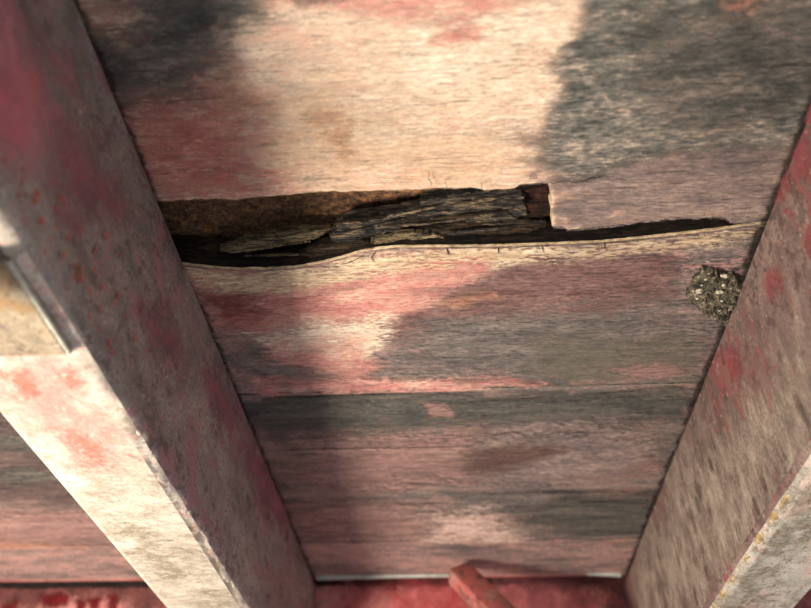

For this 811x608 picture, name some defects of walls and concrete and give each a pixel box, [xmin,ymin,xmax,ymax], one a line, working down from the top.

water stain [74,0,271,205]
crack [530,175,612,183]
water stain [520,0,811,283]
water stain [41,593,119,608]